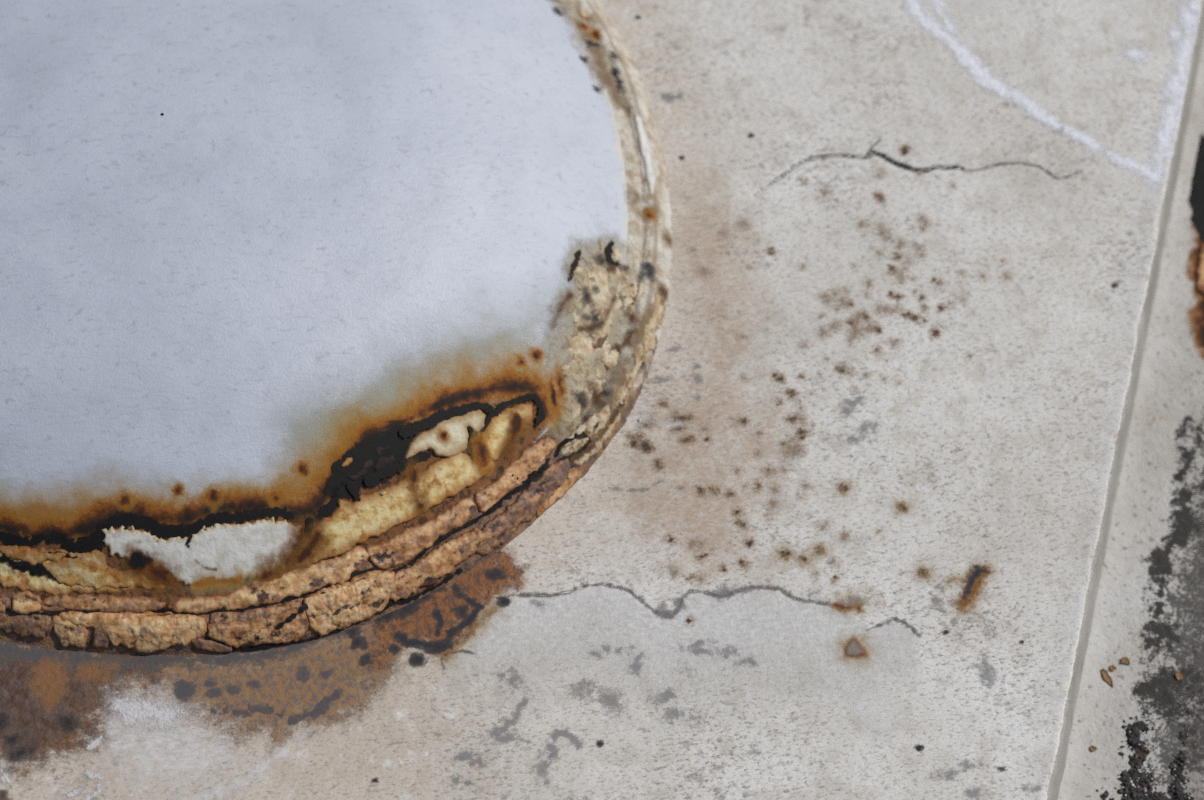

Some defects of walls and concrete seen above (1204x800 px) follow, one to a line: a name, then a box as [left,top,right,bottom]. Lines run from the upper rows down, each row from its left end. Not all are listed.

rust [630,189,659,221]
peeling [634,114,656,196]
crack [755,139,1081,196]
rust [820,222,964,352]
peeling [0,293,665,653]
rust [0,284,682,607]
rust [611,364,814,572]
rust [0,550,524,777]
rust [780,545,839,583]
rust [917,565,991,611]
water stain [1129,403,1204,794]